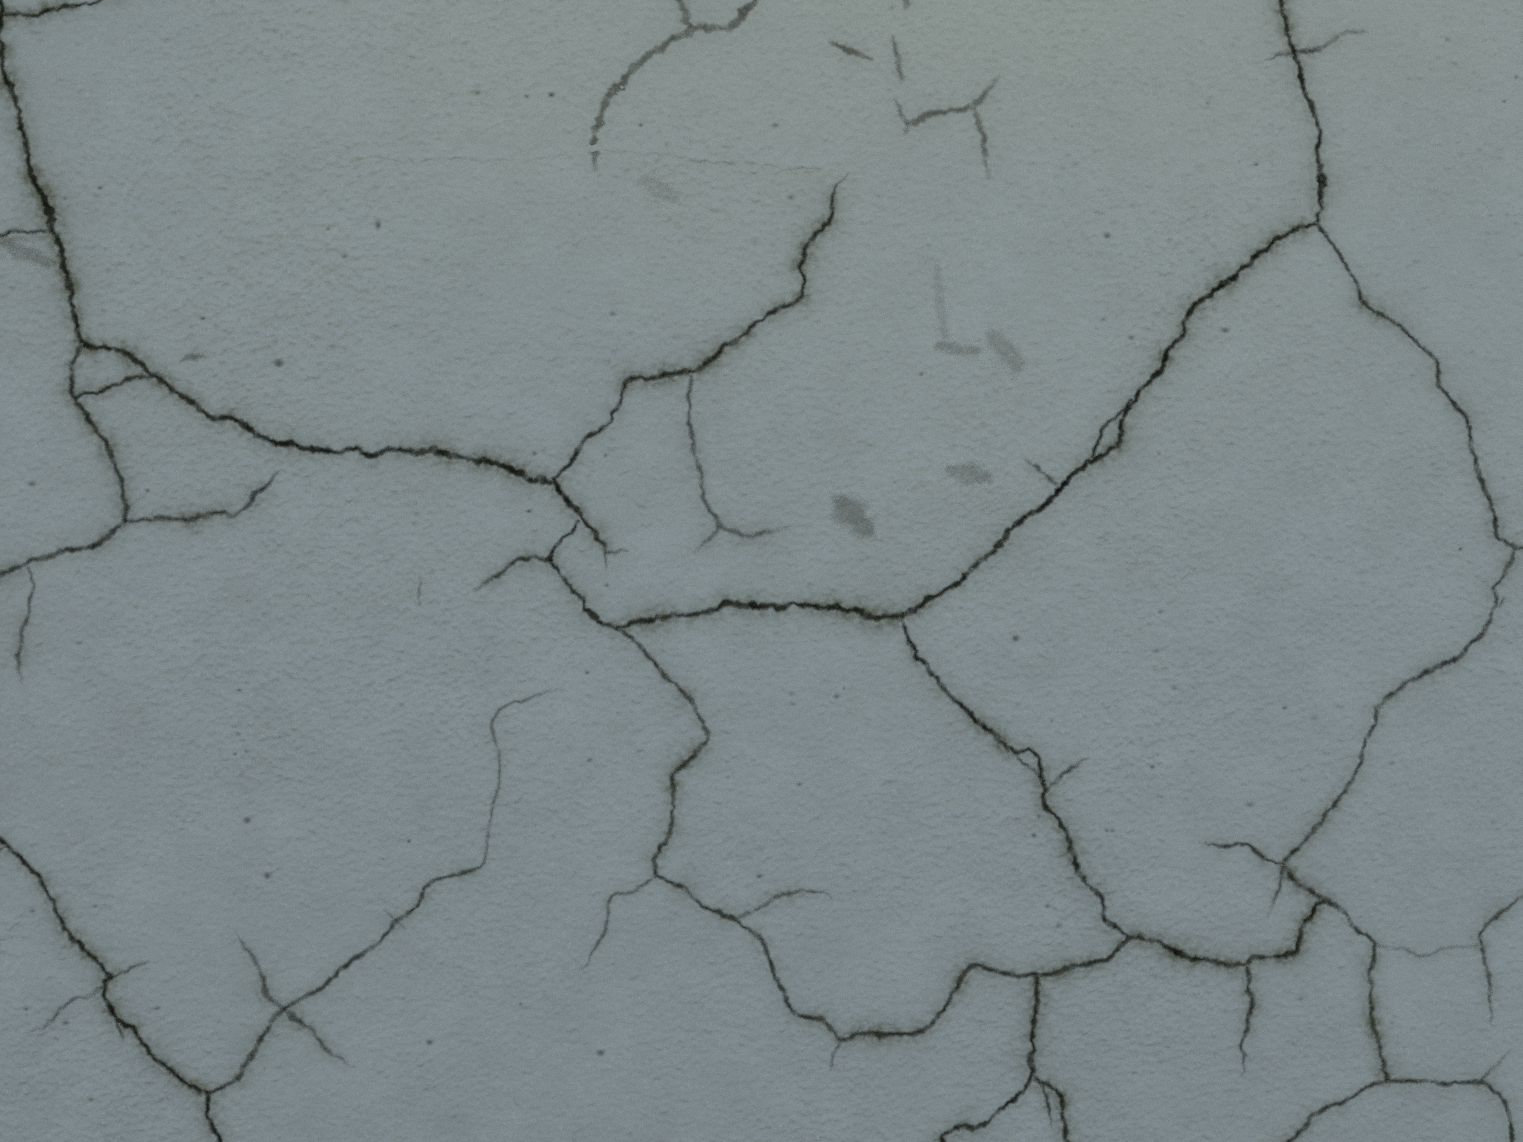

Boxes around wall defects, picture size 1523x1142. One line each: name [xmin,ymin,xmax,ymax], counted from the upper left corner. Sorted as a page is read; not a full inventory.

crack [0,0,1477,702]
crack [1386,474,1523,698]
crack [0,838,478,1142]
crack [653,714,708,888]
crack [696,900,750,930]
crack [759,671,1145,1142]
crack [1157,710,1377,1050]
crack [1287,927,1421,1142]
crack [1441,1080,1514,1142]
crack [1480,909,1507,996]